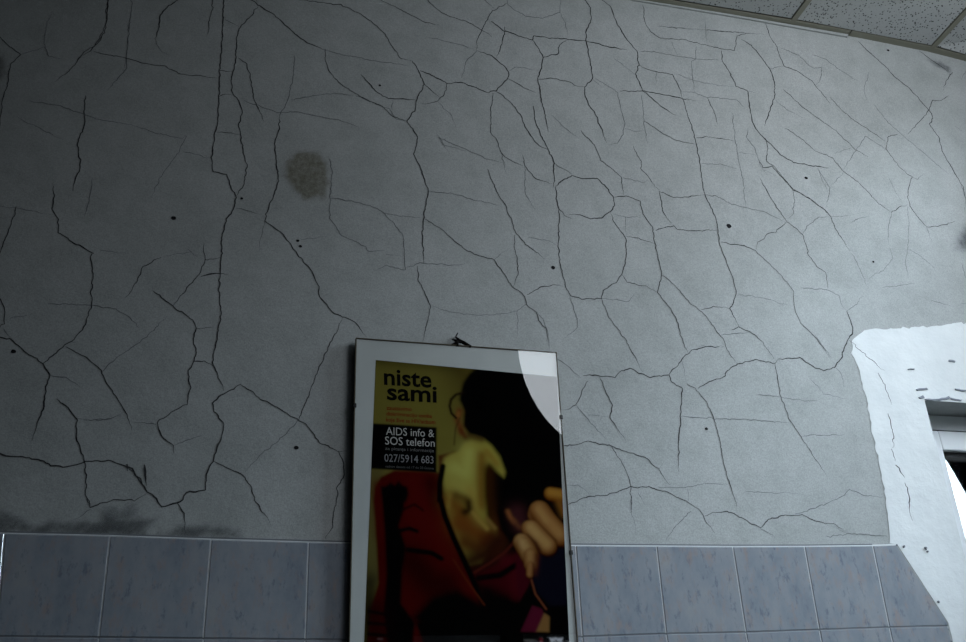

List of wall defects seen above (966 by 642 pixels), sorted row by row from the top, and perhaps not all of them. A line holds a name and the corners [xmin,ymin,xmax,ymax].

crack [0,0,891,538]
crack [815,104,955,279]
crack [858,41,966,210]
crack [888,415,913,521]